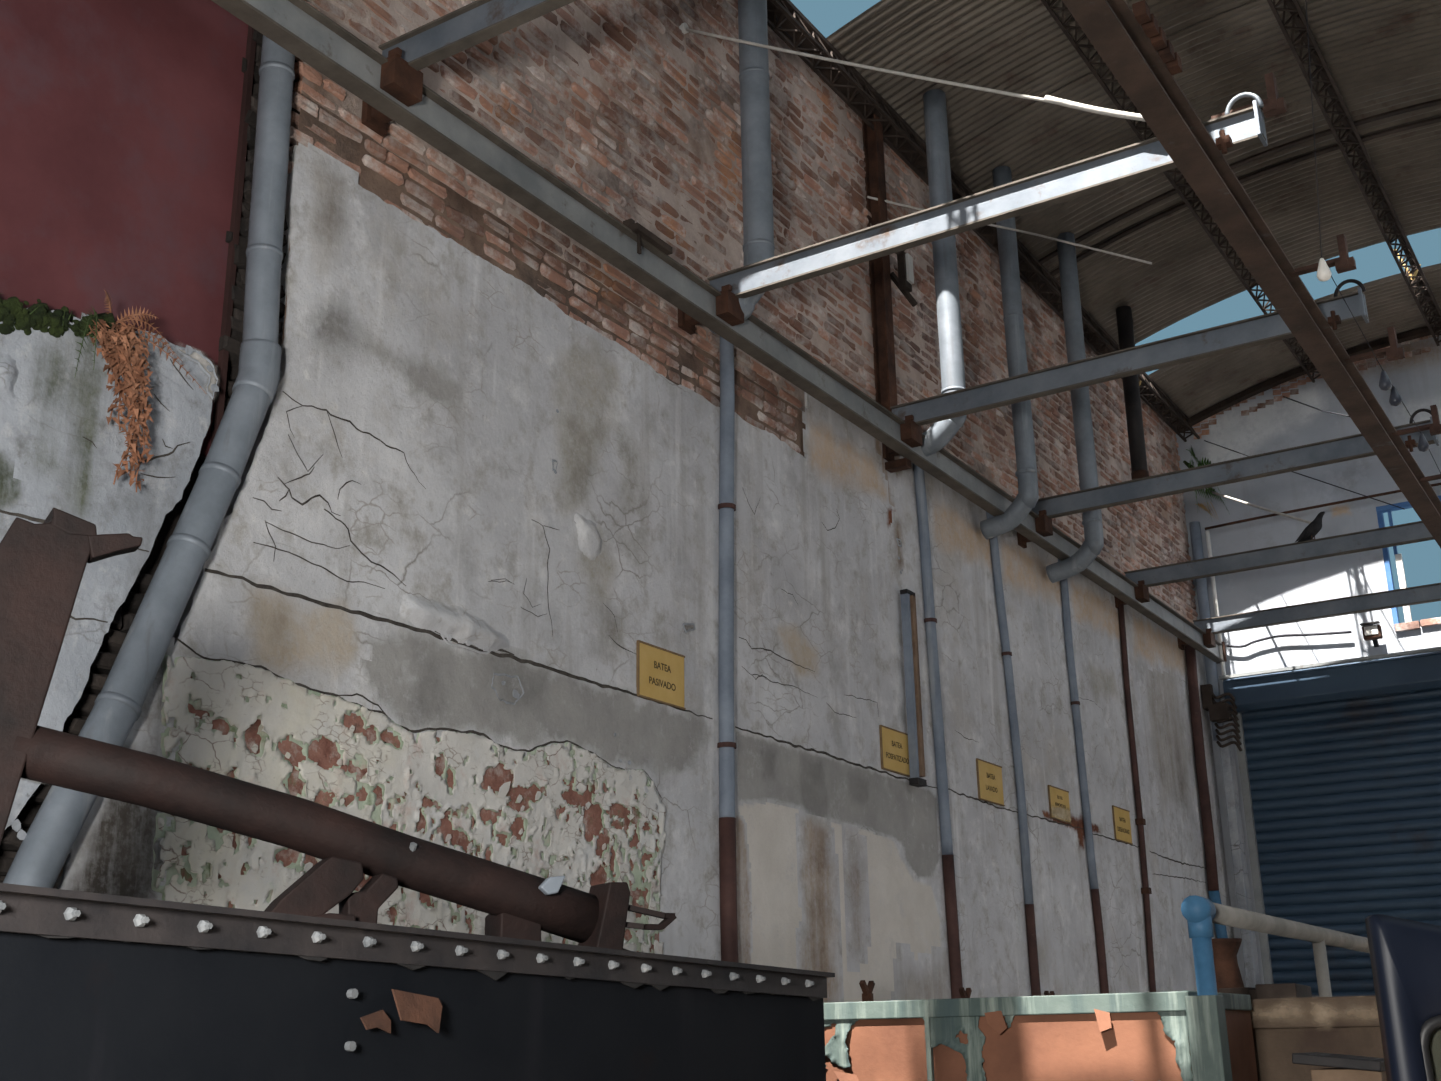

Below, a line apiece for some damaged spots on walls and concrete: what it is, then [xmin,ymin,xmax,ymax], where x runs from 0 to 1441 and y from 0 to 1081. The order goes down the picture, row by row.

water stain [802,407,907,583]
water stain [235,321,715,786]
crack [70,615,108,623]
crack [177,391,1206,883]
water stain [774,616,822,688]
peeling [151,654,666,954]
water stain [735,729,952,1003]
corrosion [1041,808,1101,854]
peeling [824,1020,859,1081]
peeling [923,1011,1015,1081]
peeling [1094,1009,1112,1032]
peeling [1157,1011,1193,1081]